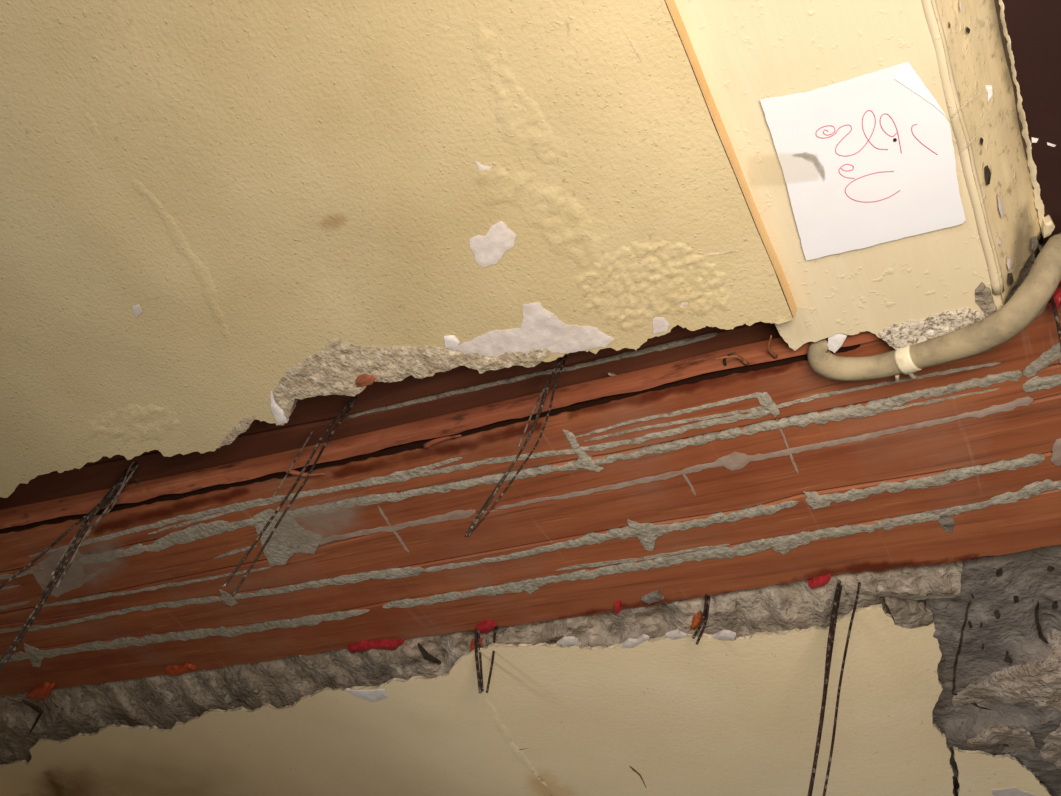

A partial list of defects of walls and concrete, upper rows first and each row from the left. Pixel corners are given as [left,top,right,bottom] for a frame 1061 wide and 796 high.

peeling [469,221,516,267]
flaking render [270,302,614,425]
peeling [653,317,669,334]
peeling [827,333,847,353]
flaking render [219,415,254,447]
rust [96,490,247,532]
spalling [0,545,1061,796]